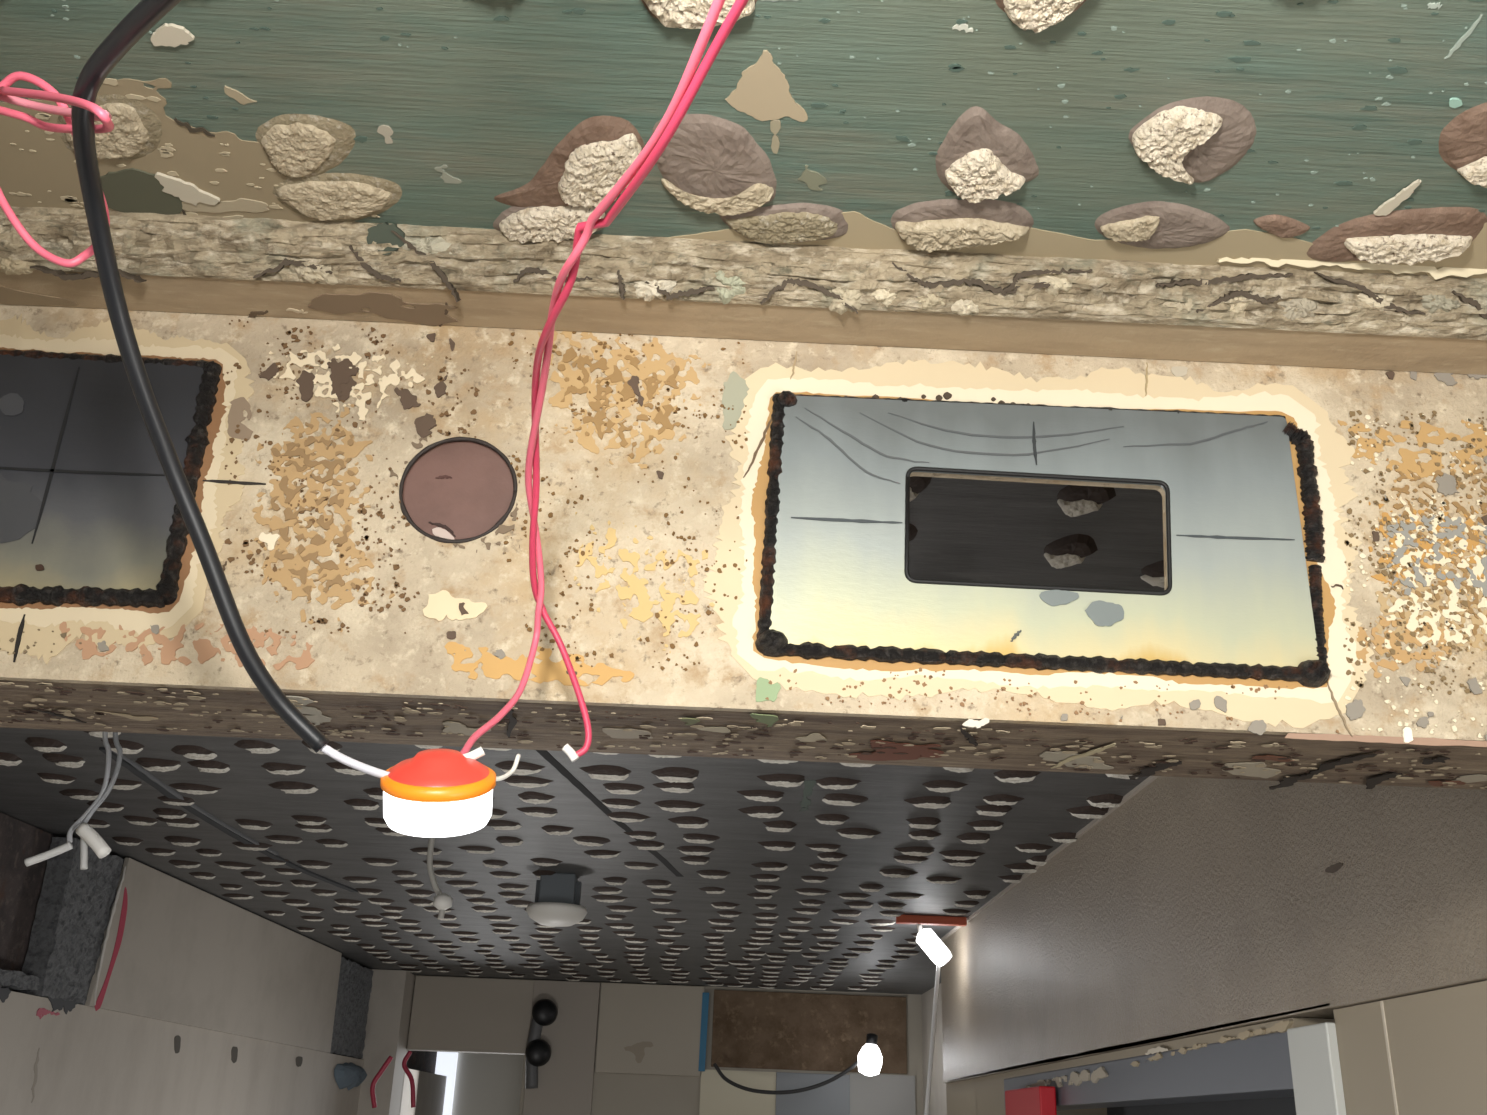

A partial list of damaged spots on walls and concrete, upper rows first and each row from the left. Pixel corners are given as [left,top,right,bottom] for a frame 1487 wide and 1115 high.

spalling [100,168,220,215]
spalling [366,222,452,255]
crack [253,230,461,327]
crack [513,267,715,300]
peeling [634,280,677,302]
crack [760,278,858,313]
peeling [829,285,897,315]
crack [892,262,1093,296]
peeling [1039,274,1072,297]
crack [1155,272,1487,318]
peeling [1357,292,1394,311]
corrosion [1338,410,1487,695]